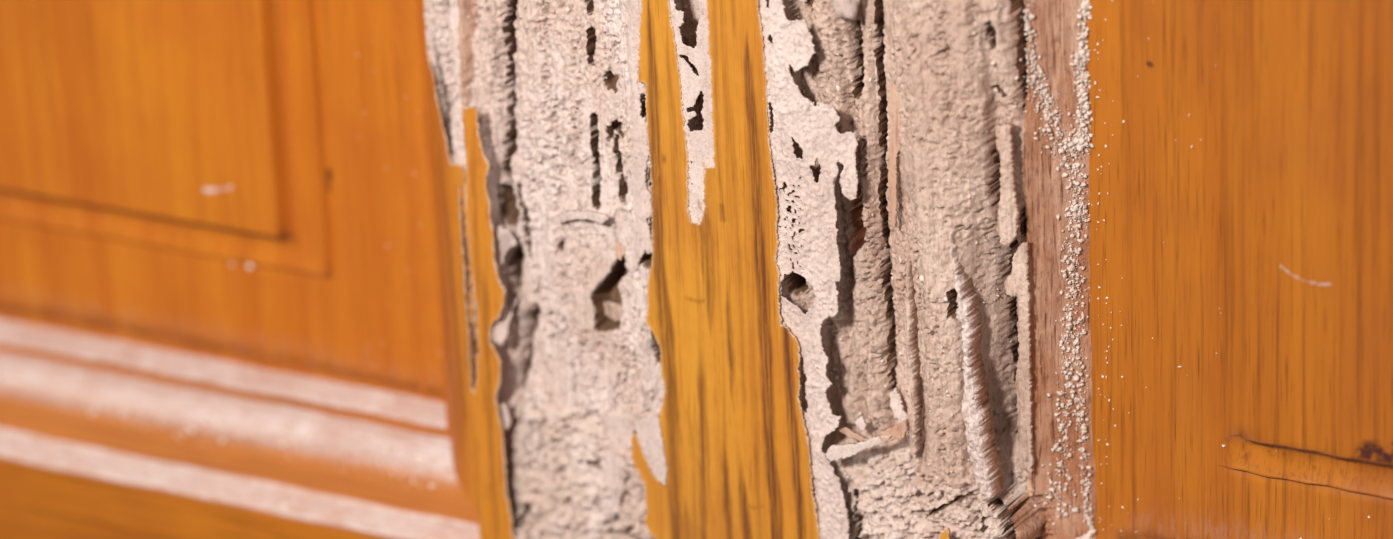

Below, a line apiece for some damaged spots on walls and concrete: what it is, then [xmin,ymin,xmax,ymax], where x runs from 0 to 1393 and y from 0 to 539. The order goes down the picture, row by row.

peeling [494,225,518,265]
peeling [492,297,518,346]
peeling [603,299,623,322]
peeling [855,415,868,431]
peeling [889,386,909,424]